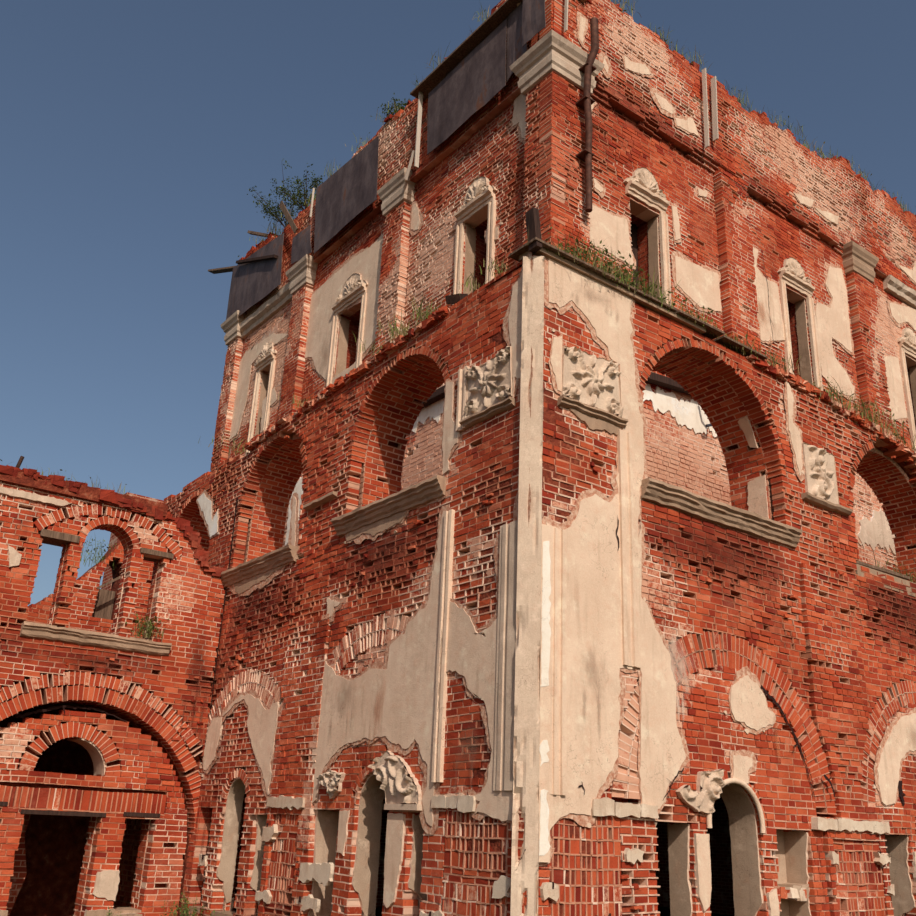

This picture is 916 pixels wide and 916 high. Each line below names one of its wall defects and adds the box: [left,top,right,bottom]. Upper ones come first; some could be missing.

peeling [196,331,315,539]
peeling [305,205,386,384]
peeling [671,205,722,313]
peeling [795,266,856,401]
peeling [884,355,916,423]
peeling [227,378,531,916]
peeling [502,246,811,916]
spalling [805,545,916,667]
peeling [858,508,896,555]
peeling [169,664,281,801]
peeling [824,707,916,807]
peeling [216,777,267,911]